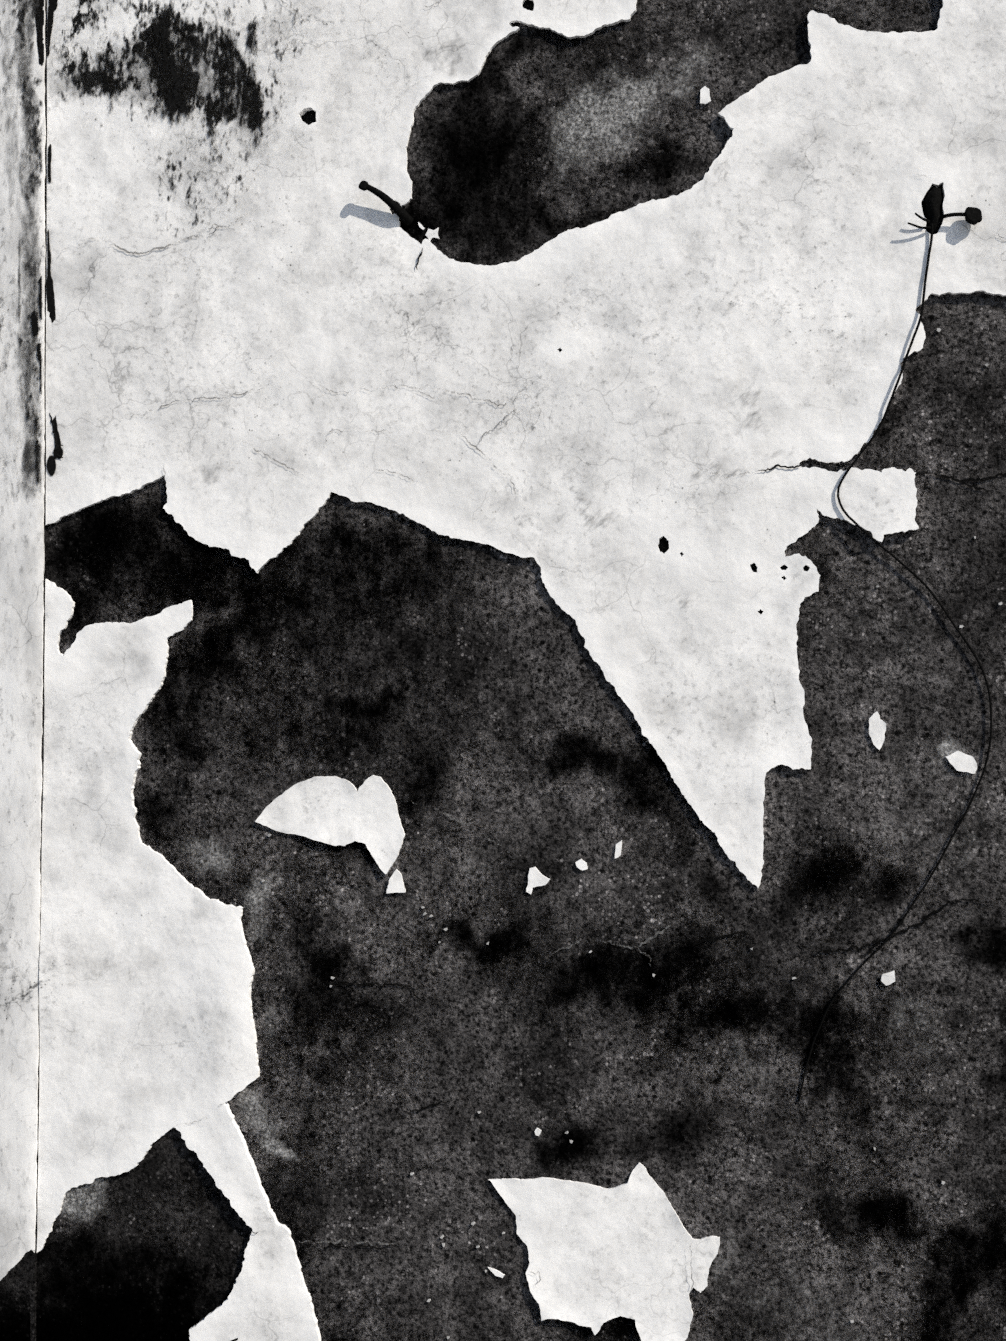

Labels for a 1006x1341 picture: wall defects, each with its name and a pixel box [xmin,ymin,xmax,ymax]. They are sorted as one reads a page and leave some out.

peeling [390,0,944,266]
water stain [0,0,297,488]
peeling [103,476,167,507]
crack [717,464,802,475]
crack [915,472,1006,492]
peeling [46,512,170,623]
peeling [59,626,77,654]
peeling [131,292,1006,1341]
crack [788,898,997,957]
peeling [0,1127,252,1341]